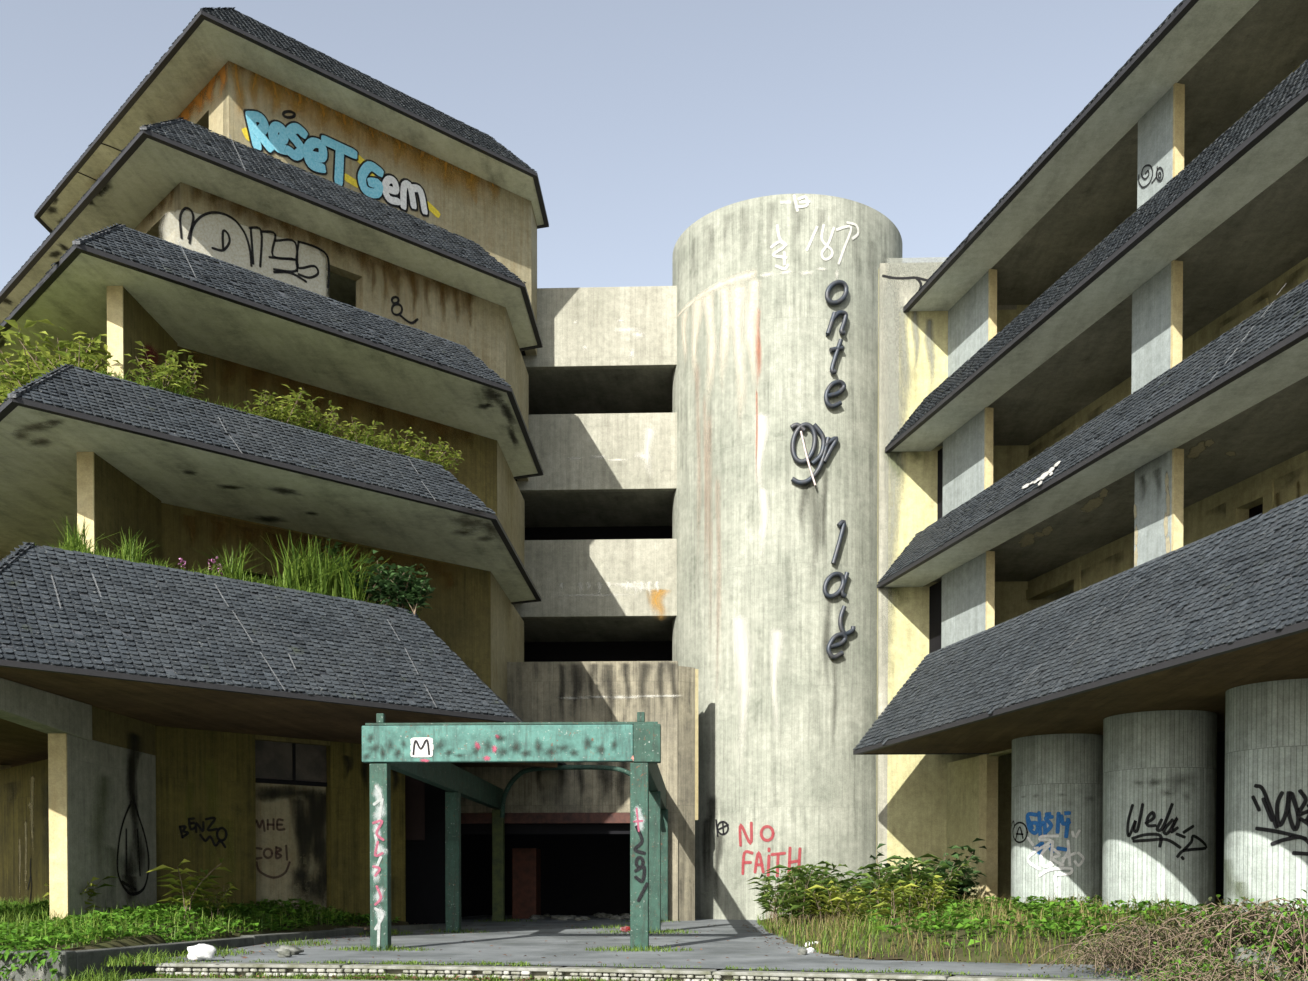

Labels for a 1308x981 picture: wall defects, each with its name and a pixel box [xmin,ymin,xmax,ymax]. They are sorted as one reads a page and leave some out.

rust [176,65,227,120]
water stain [361,252,471,317]
water stain [677,268,838,392]
water stain [757,415,766,468]
water stain [212,515,452,584]
rust [652,590,665,610]
water stain [560,664,676,702]
water stain [736,618,747,716]
water stain [772,632,780,697]
water stain [19,777,34,879]
water stain [128,759,138,839]